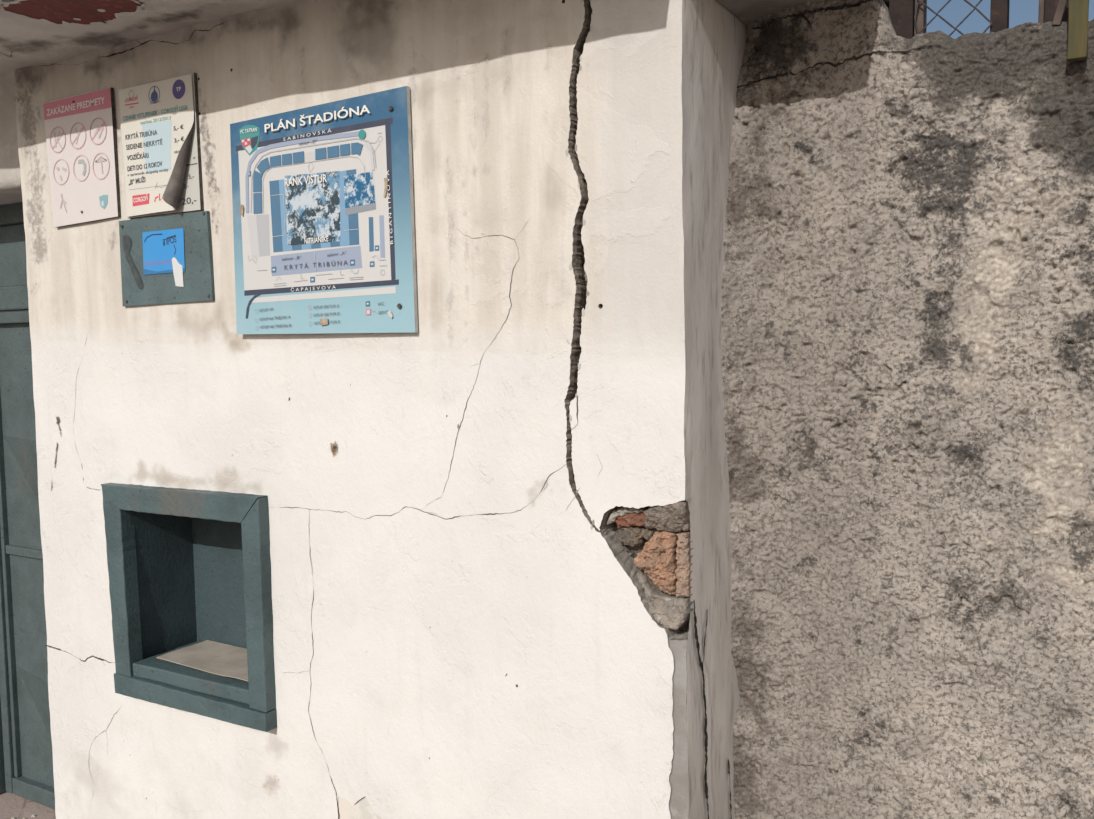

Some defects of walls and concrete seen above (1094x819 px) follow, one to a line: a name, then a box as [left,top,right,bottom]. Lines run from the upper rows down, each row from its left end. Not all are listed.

peeling [1,0,144,26]
leakage [747,11,819,77]
crack [734,0,873,40]
crack [737,44,940,88]
leakage [794,138,825,170]
leakage [894,19,1094,395]
crack [271,0,611,819]
leakage [948,433,988,486]
leakage [1022,422,1094,590]
crack [45,645,114,663]
flaking render [599,498,694,819]
peeling [338,796,382,819]